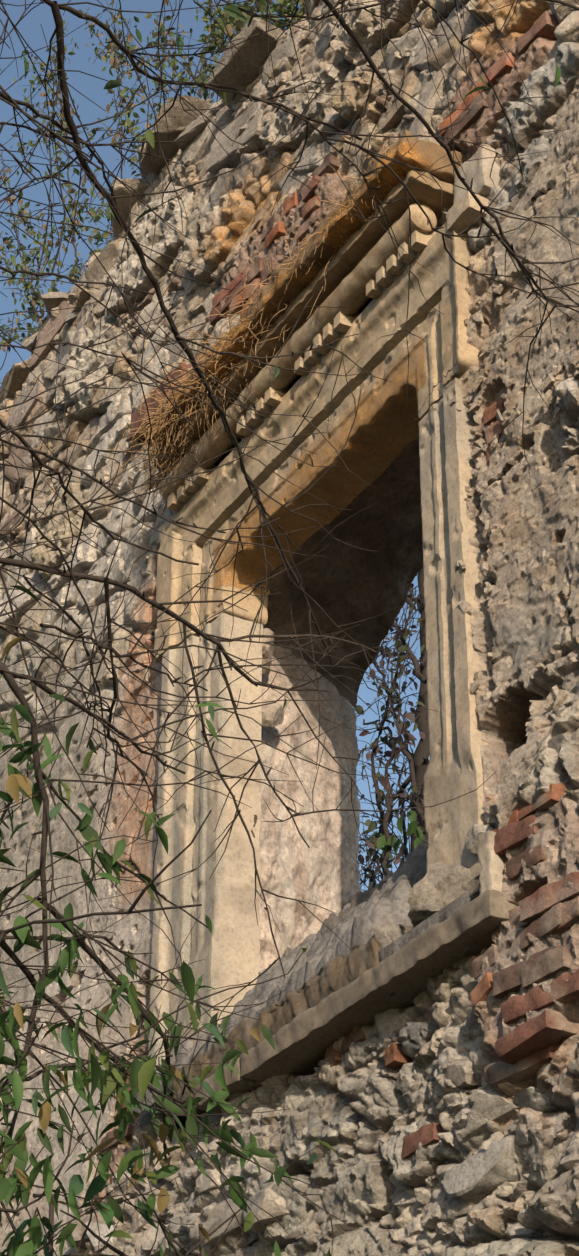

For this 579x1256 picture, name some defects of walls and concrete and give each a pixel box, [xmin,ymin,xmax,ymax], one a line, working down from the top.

flaking render [439,11,559,158]
flaking render [470,650,579,1088]